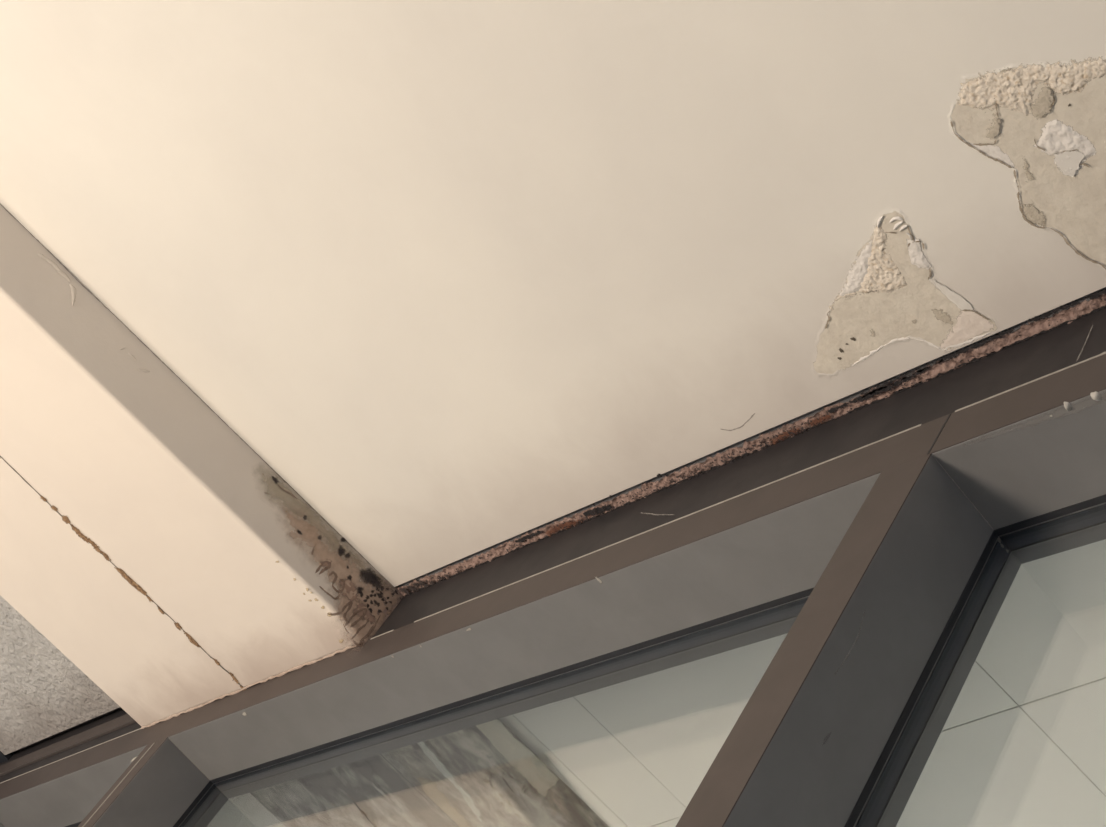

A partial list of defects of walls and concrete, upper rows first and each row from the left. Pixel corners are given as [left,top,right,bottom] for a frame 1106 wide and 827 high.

peeling [945,53,1106,275]
peeling [808,206,1002,380]
crack [0,456,62,517]
crack [146,595,246,687]
damp [264,476,494,647]
damp [554,399,858,529]